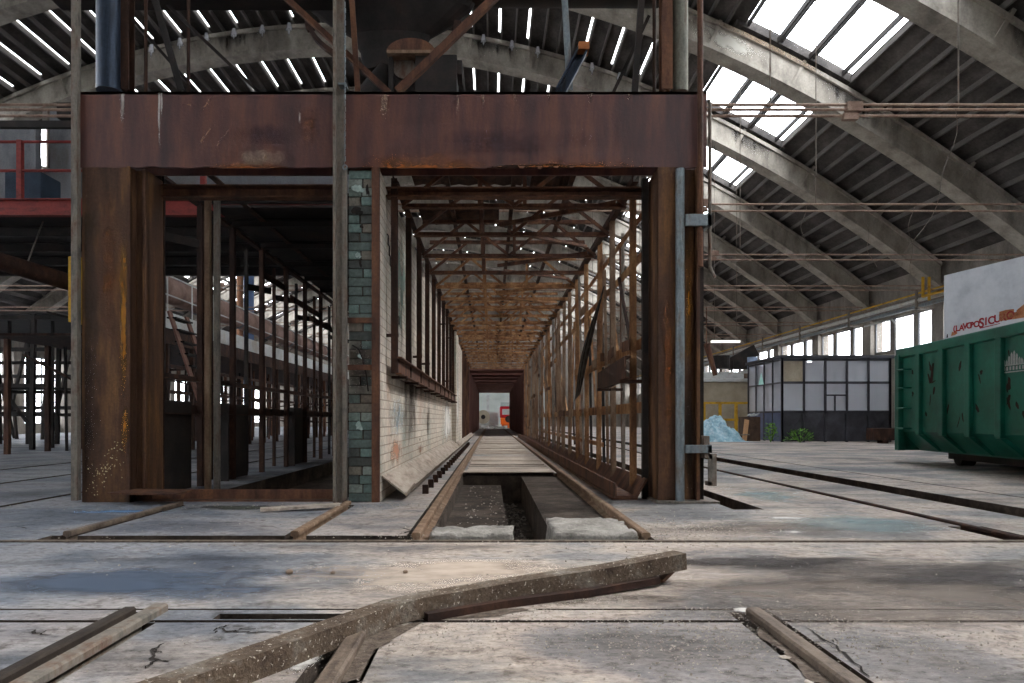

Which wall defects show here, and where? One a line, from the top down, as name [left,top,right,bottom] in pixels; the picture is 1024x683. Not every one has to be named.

rust [383,156,472,168]
rust [104,254,127,367]
crack [808,628,869,676]